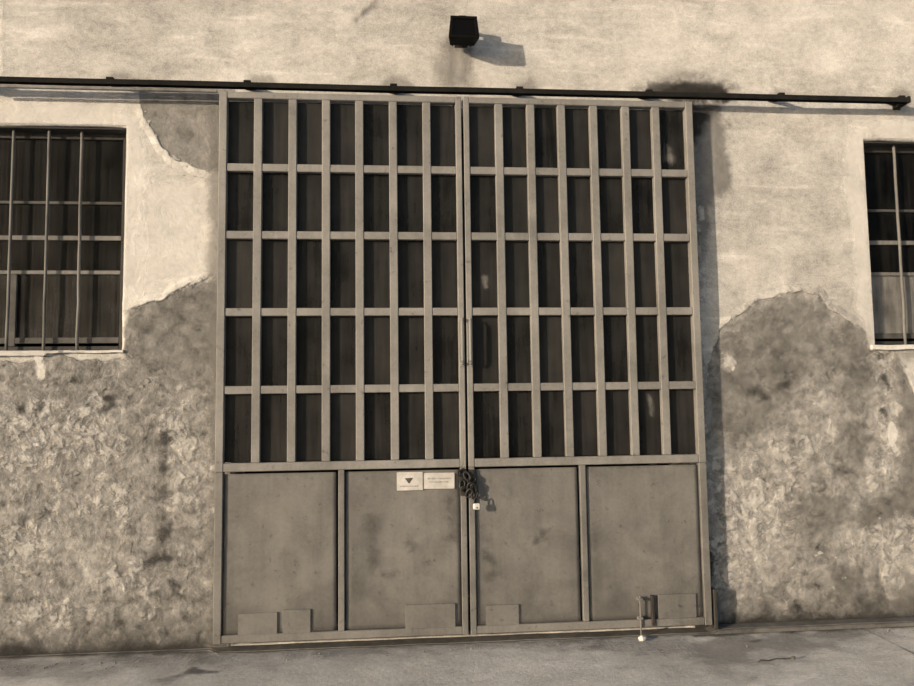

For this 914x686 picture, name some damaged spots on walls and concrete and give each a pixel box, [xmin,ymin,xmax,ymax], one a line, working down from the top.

flaking render [133,87,235,179]
water stain [647,75,729,248]
flaking render [0,272,215,653]
flaking render [688,284,914,623]